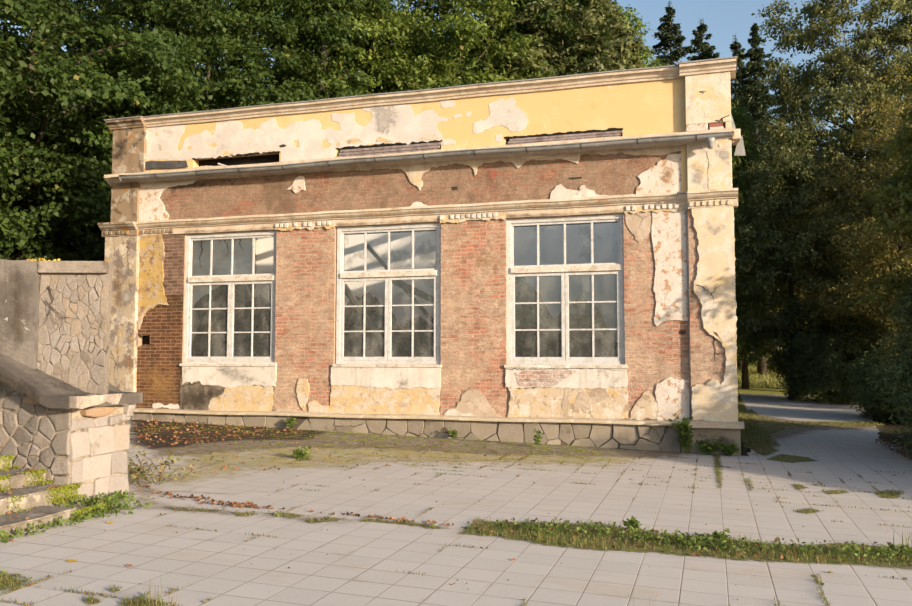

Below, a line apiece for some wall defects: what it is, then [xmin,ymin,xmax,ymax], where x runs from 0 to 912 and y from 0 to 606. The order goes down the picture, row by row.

peeling [147,97,623,162]
flaking render [160,151,681,220]
flaking render [69,211,691,421]
leakage [152,389,219,410]
leakage [130,420,324,449]